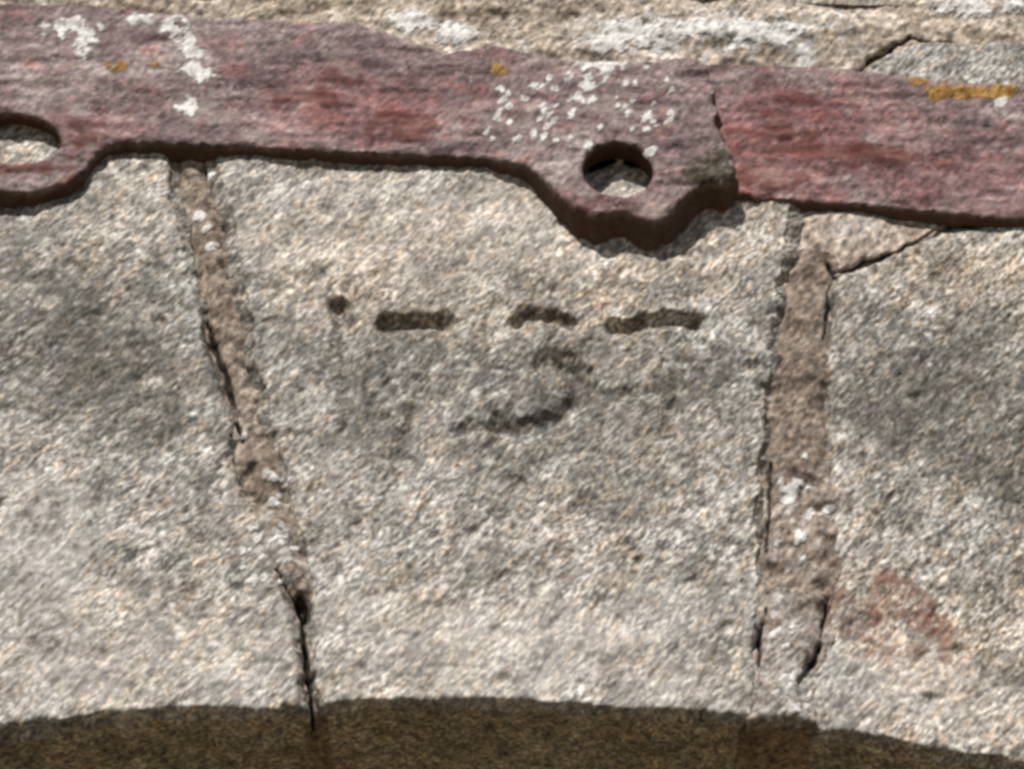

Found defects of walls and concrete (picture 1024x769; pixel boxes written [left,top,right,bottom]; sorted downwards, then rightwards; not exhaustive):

crack [822,231,934,340]
crack [206,325,244,445]
crack [764,463,773,553]
crack [276,570,315,732]
crack [756,609,768,672]
crack [797,598,828,685]